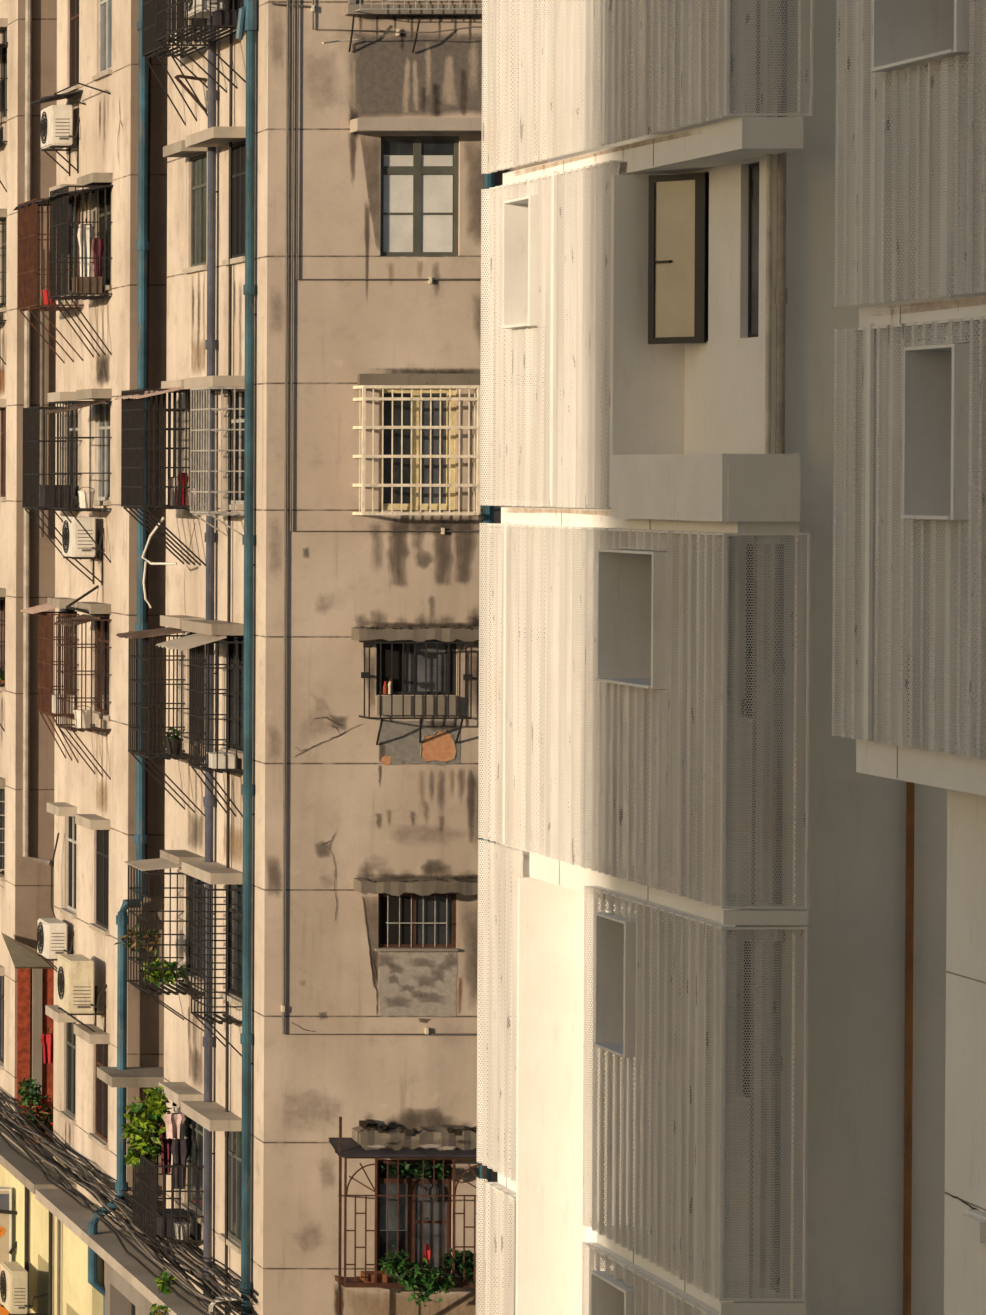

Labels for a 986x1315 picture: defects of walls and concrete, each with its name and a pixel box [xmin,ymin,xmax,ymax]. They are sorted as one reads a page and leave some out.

water stain [350,15,519,282]
water stain [390,519,472,584]
crack [296,717,363,756]
flaking render [379,720,461,766]
water stain [460,773,501,834]
crack [323,832,378,1011]